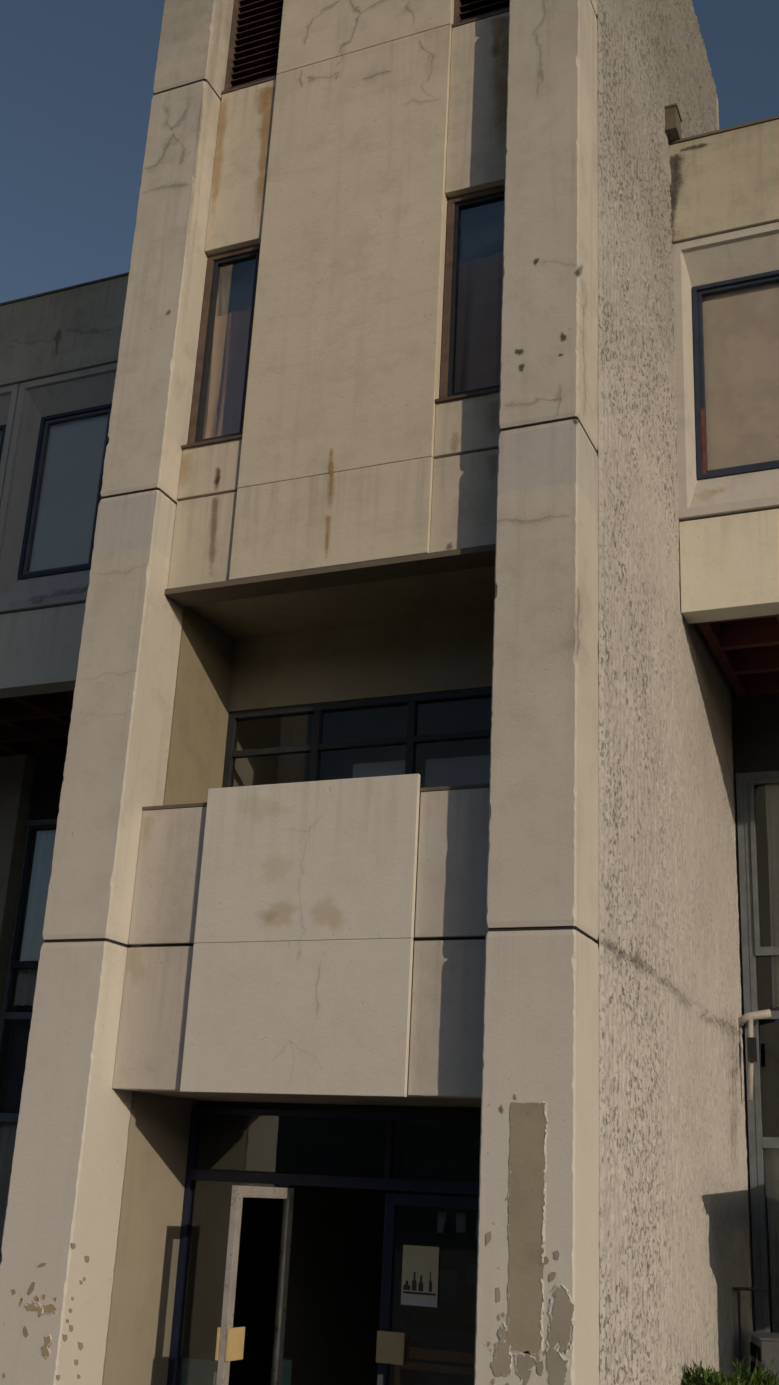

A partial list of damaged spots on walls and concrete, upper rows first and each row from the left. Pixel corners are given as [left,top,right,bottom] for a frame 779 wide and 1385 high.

corrosion [494,18,509,120]
peeling [485,1094,575,1385]
peeling [12,1243,89,1379]